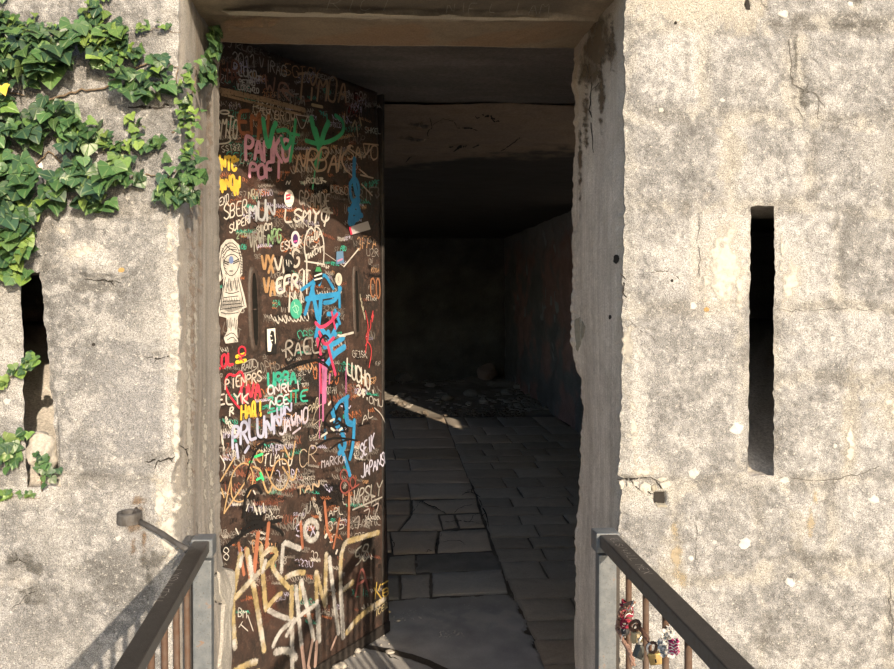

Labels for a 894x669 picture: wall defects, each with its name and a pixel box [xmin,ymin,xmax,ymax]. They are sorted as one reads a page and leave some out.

leakage [578,18,615,185]
crack [788,41,859,127]
crack [411,488,489,553]
peeling [651,477,671,491]